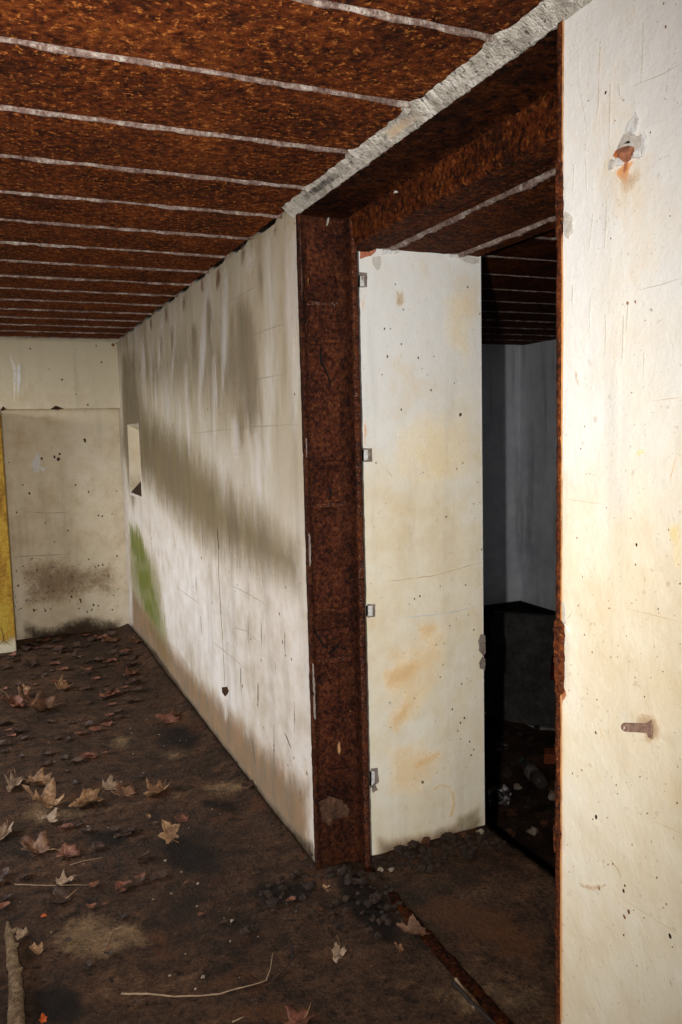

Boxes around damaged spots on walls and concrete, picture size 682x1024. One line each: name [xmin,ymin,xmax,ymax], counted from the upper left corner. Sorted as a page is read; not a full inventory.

rust [617,162,635,183]
flaking render [608,112,651,170]
water stain [286,239,298,345]
water stain [122,276,296,581]
water stain [27,565,108,599]
water stain [129,525,162,640]